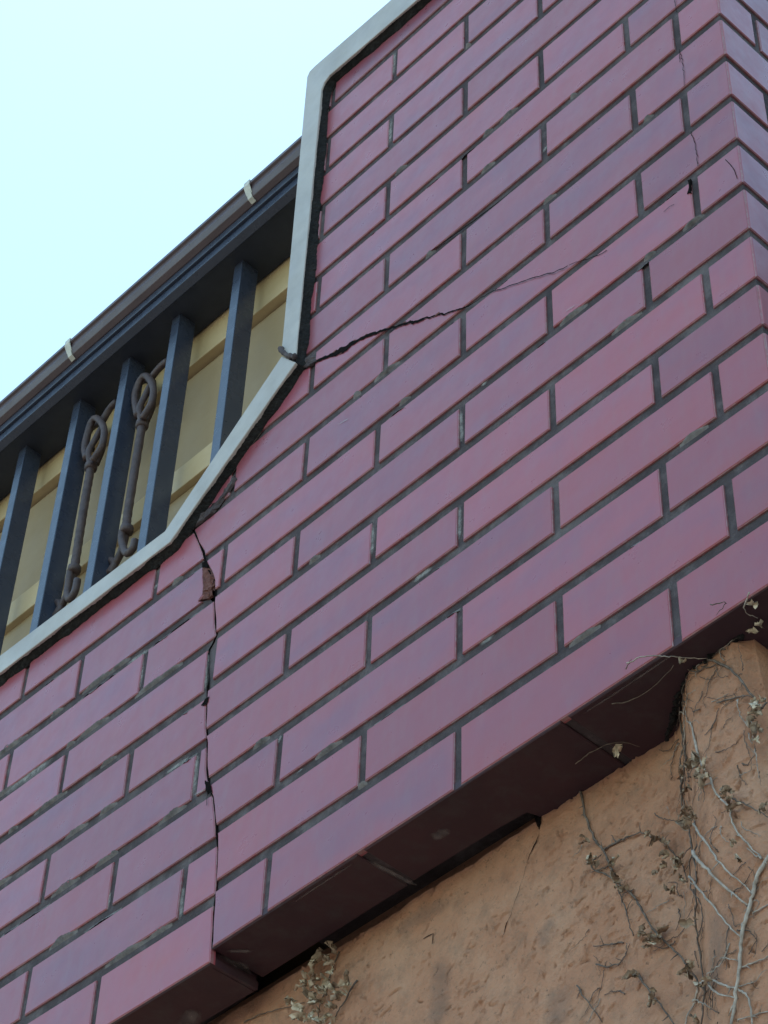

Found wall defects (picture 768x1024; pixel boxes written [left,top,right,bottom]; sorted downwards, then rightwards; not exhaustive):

crack [668,134,698,208]
crack [304,250,607,370]
crack [192,530,219,942]
crack [502,815,541,937]